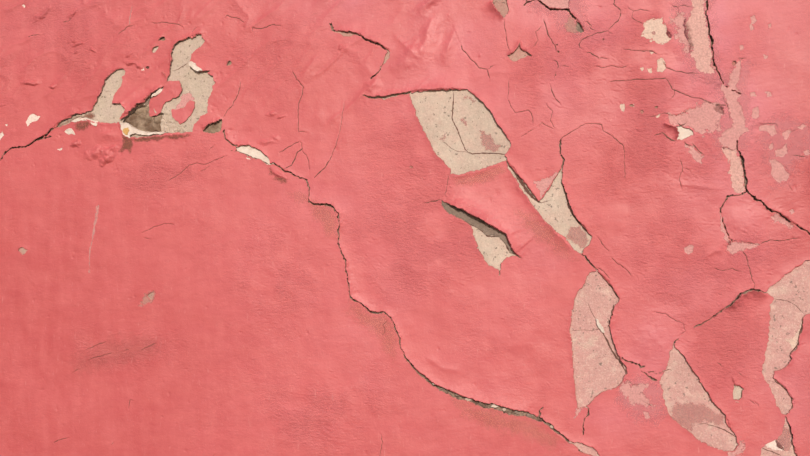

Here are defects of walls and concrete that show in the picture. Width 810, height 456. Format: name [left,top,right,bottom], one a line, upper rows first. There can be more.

crack [0,128,52,160]
peeling [50,34,225,138]
crack [329,23,388,79]
crack [271,73,589,444]
peeling [363,89,592,254]
peeling [441,200,521,276]
crack [508,0,741,170]
crack [654,140,810,347]
peeling [569,267,628,409]
crack [621,358,663,385]
peeling [659,344,738,452]
peeling [760,260,810,456]